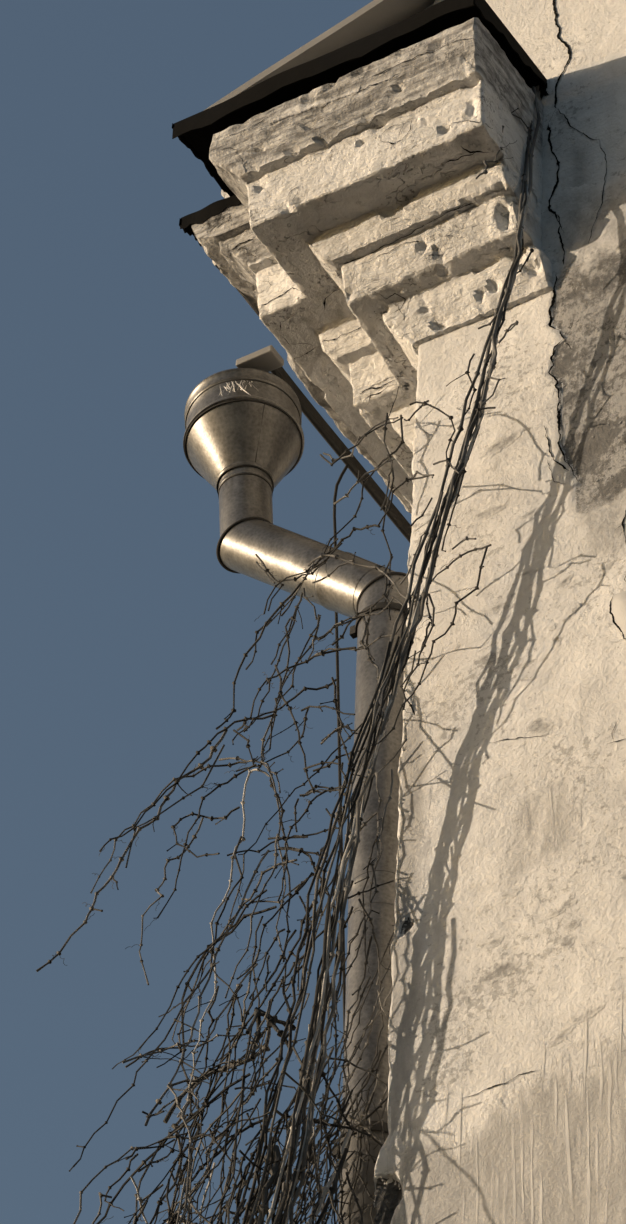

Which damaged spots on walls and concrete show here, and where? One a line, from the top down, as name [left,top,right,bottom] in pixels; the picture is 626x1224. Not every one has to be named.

crack [356,38,472,93]
crack [443,120,493,165]
crack [541,0,607,484]
crack [230,203,473,359]
crack [360,381,392,400]
peeling [552,240,626,512]
crack [609,576,626,641]
damp [379,706,626,1224]
crack [464,1070,537,1098]
spalling [374,1178,402,1224]